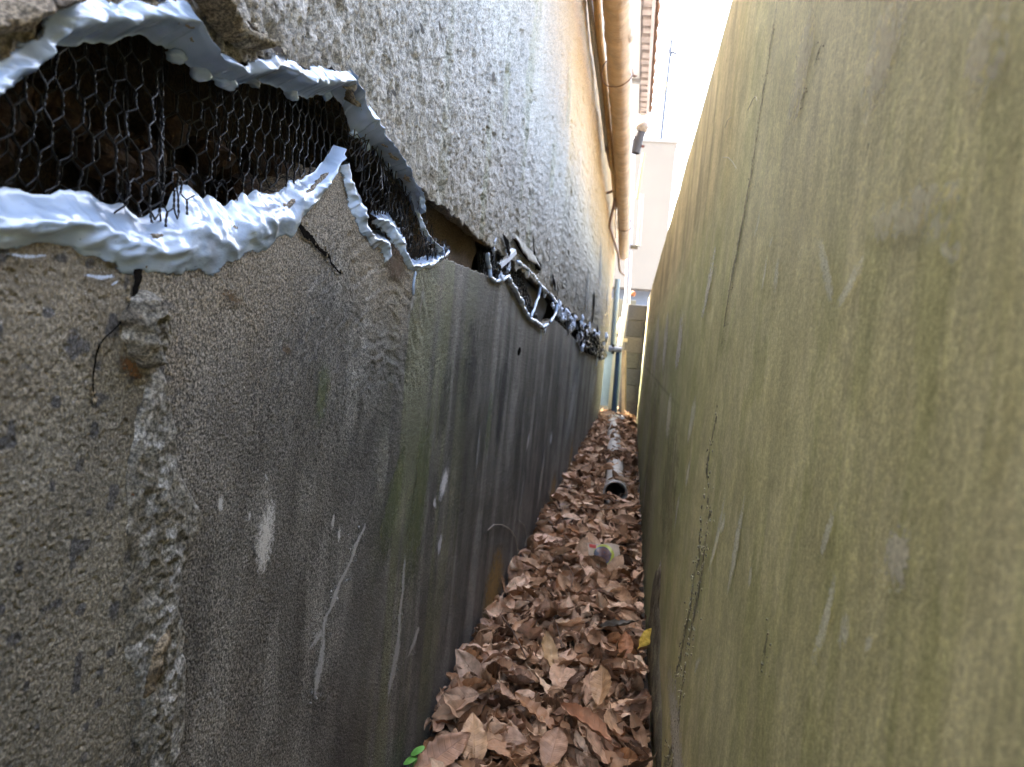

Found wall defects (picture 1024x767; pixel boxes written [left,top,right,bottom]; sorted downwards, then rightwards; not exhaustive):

spalling [0,0,450,296]
crack [298,221,343,274]
spalling [477,235,608,366]
crack [721,0,780,344]
crack [664,410,717,767]